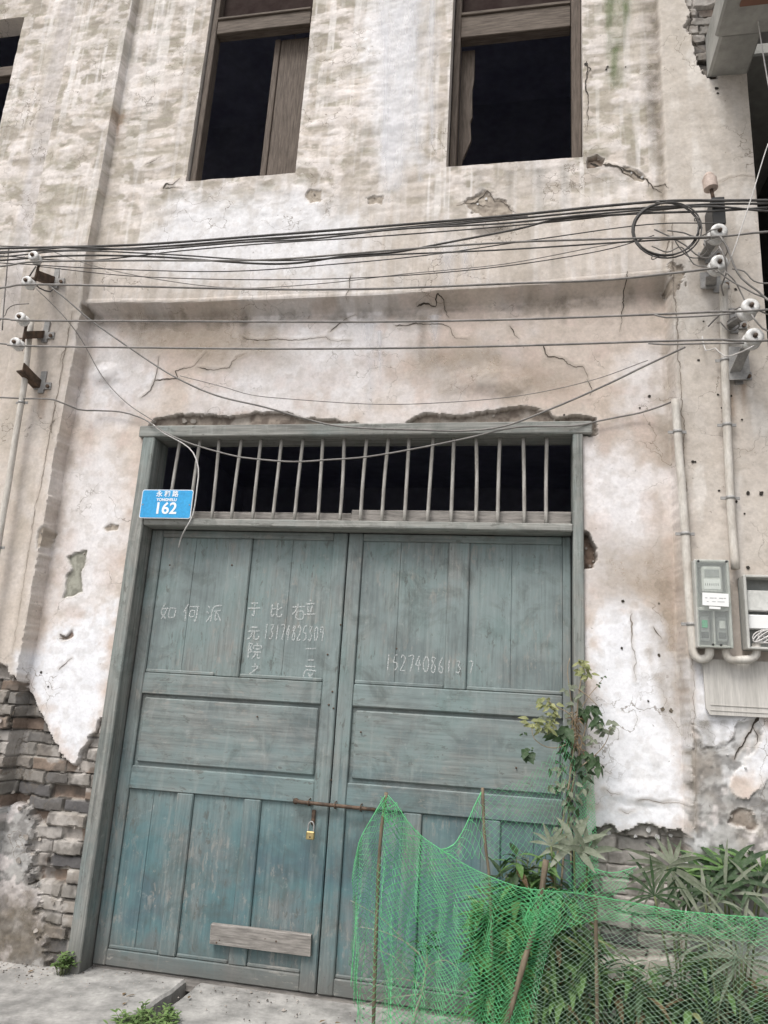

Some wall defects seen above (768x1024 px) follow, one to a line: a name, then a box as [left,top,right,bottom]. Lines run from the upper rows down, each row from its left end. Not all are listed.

flaking render [683,0,720,80]
crack [141,279,354,398]
crack [395,293,462,339]
crack [543,346,592,395]
crack [590,163,687,489]
flaking render [148,409,361,426]
flaking render [61,548,89,600]
flaking render [584,526,599,570]
crack [606,663,697,817]
crack [734,717,759,760]
flaking render [0,659,102,967]
peeling [587,718,768,971]